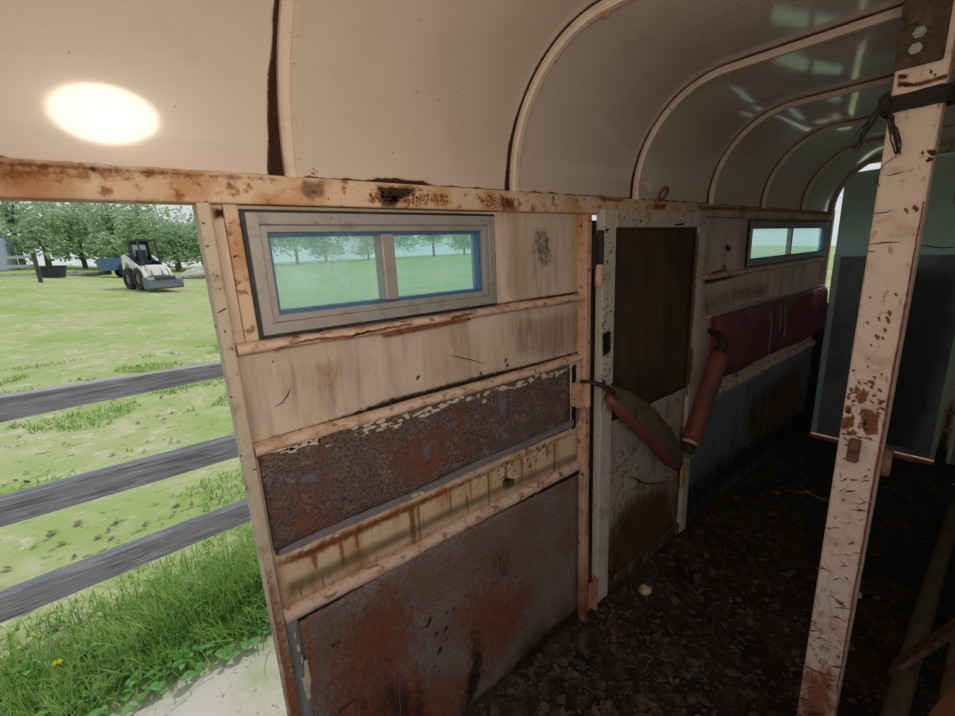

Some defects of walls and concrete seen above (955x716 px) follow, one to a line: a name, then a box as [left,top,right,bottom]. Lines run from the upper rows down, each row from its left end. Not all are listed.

corrosion [478,0,602,212]
corrosion [0,162,130,184]
corrosion [369,186,451,207]
corrosion [280,471,491,569]
peeling [270,366,571,453]
peeling [279,408,581,556]
corrosion [465,470,580,531]
corrosion [797,201,924,716]
corrosion [265,574,378,716]